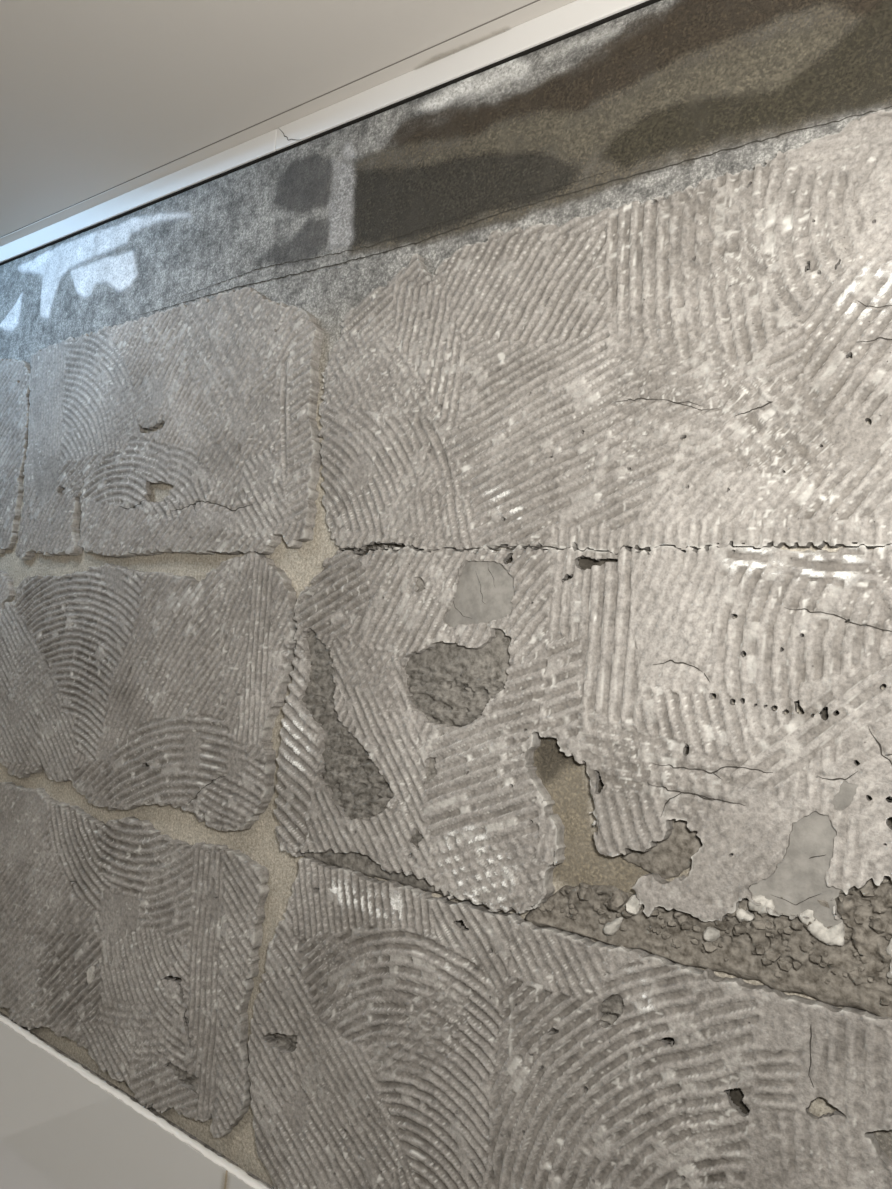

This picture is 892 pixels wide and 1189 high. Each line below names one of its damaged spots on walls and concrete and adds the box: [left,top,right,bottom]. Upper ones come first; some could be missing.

spalling [0,287,393,1137]
spalling [324,528,892,727]
spalling [283,728,892,1033]
spalling [597,994,624,1043]